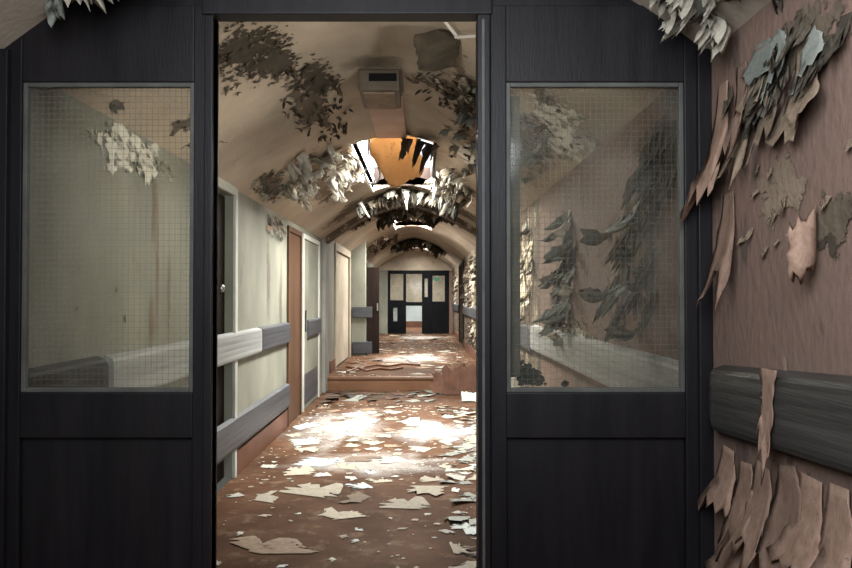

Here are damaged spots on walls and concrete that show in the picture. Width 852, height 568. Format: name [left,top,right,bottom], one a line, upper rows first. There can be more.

peeling [45,0,119,28]
peeling [87,100,174,185]
peeling [219,22,476,259]
peeling [520,88,601,185]
peeling [520,114,678,346]
peeling [451,254,476,308]
peeling [465,319,476,348]